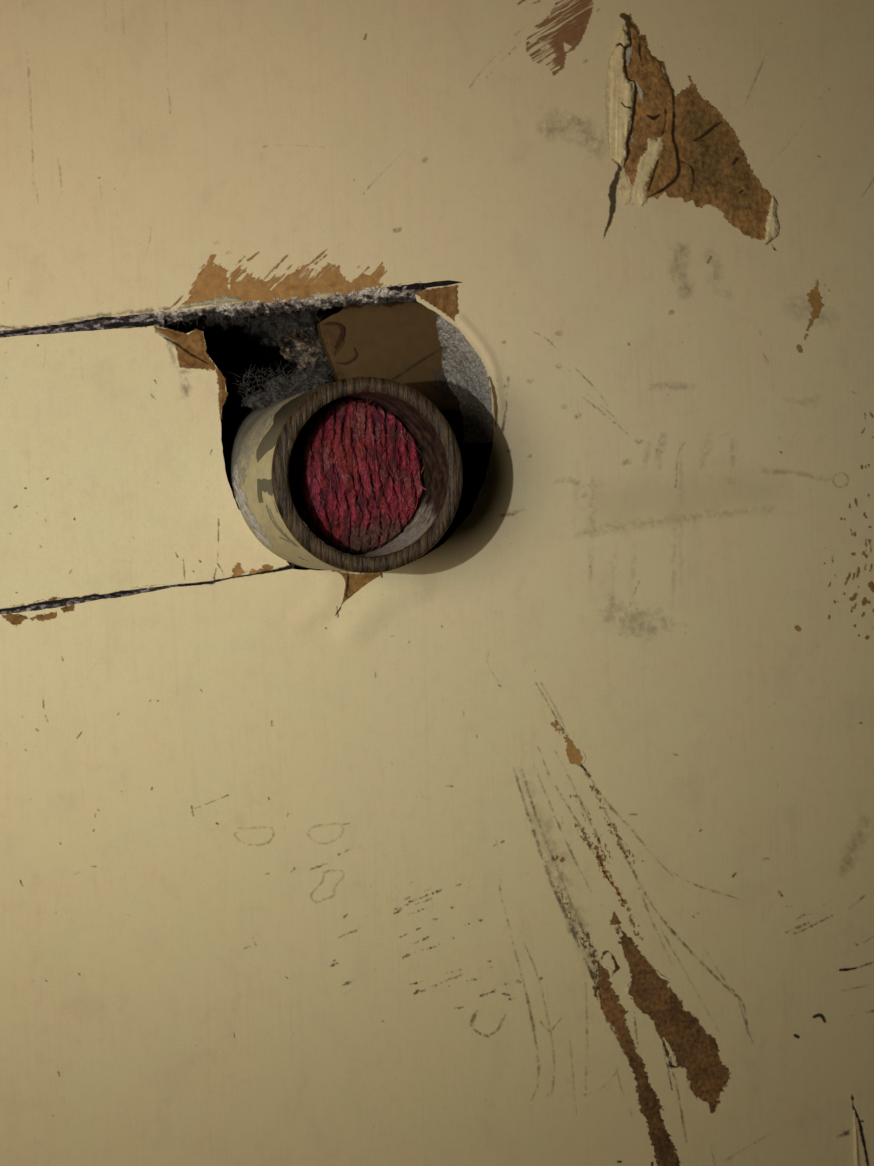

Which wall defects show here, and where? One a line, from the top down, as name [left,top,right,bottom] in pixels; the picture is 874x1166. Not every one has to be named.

spalling [132,251,430,424]
peeling [257,479,273,503]
peeling [256,378,347,462]
spalling [409,313,494,564]
crack [0,522,294,625]
peeling [828,494,874,639]
spalling [551,720,731,1166]